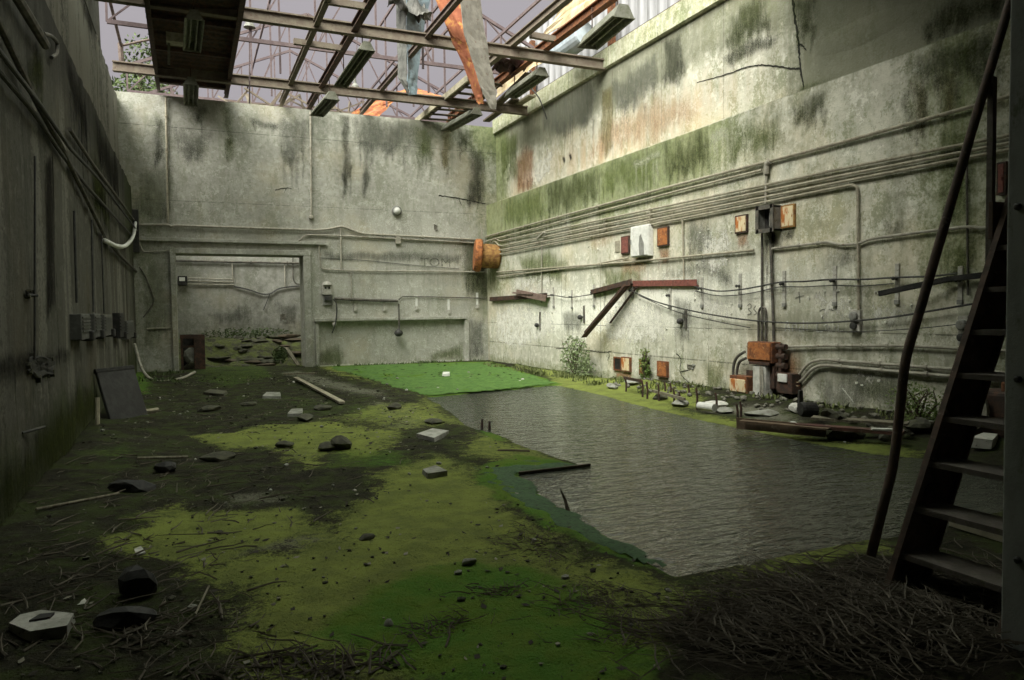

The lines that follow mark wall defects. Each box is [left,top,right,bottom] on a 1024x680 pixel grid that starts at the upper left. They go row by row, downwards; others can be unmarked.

water stain [727,2,772,62]
crack [697,0,806,90]
corrosion [518,149,532,191]